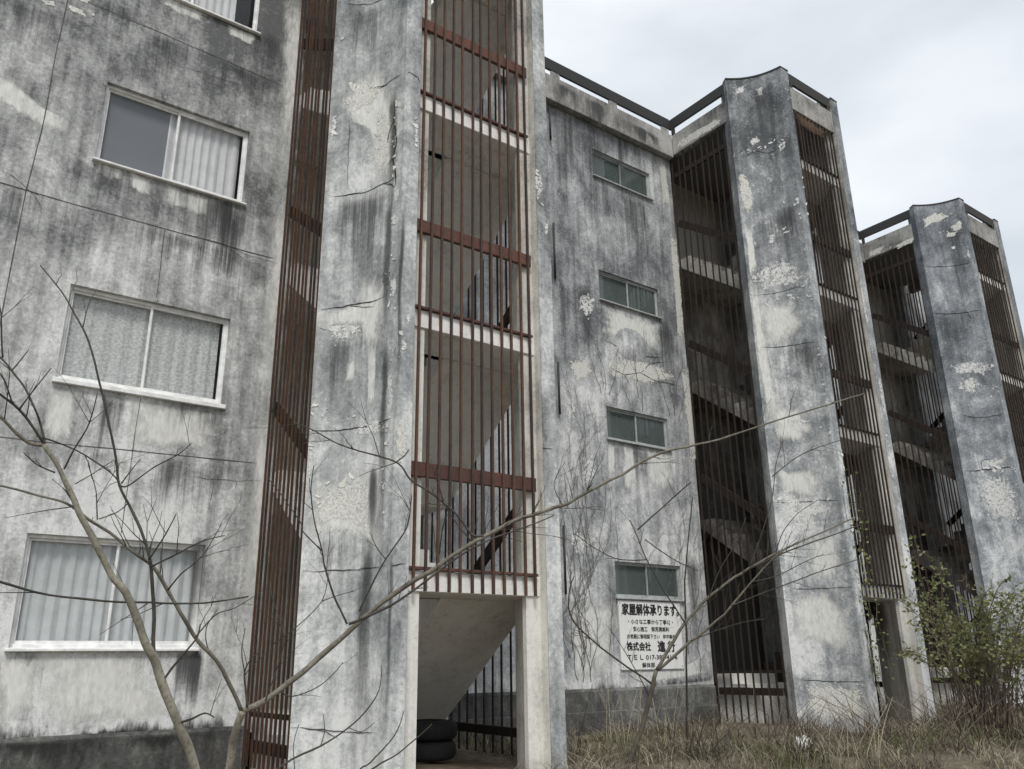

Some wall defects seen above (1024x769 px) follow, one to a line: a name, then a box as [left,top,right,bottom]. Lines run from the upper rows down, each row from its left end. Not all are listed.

crack [340,72,420,196]
leakage [589,102,604,170]
leakage [636,127,658,142]
leakage [98,163,151,194]
leakage [167,186,245,259]
peeling [343,80,404,321]
peeling [750,169,813,307]
spalling [923,213,971,258]
crack [321,298,380,310]
peeling [579,293,597,320]
peeling [951,360,999,397]
leakage [312,472,378,646]